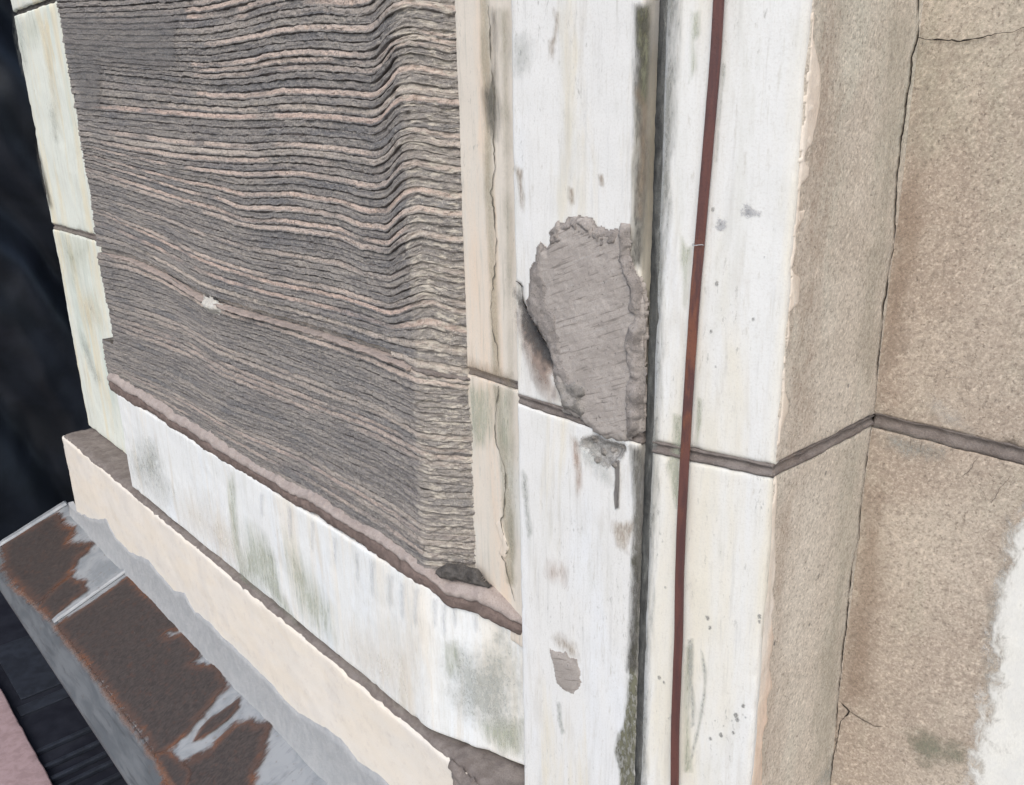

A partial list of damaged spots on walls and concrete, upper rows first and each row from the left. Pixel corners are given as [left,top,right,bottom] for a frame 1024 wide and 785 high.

crack [488,7,498,360]
corrosion [0,513,272,785]
crack [494,386,515,601]
crack [830,0,1024,785]